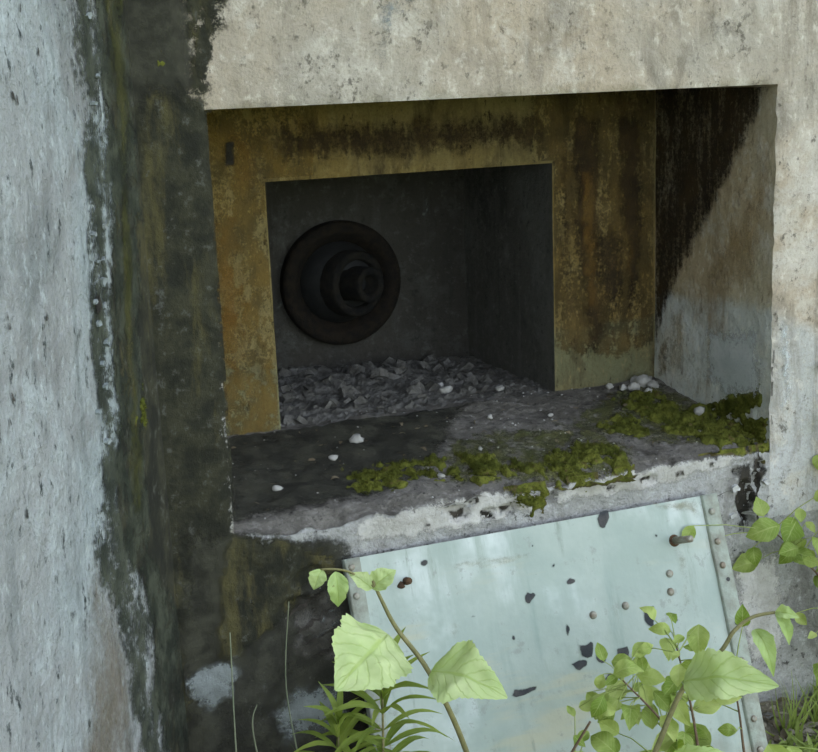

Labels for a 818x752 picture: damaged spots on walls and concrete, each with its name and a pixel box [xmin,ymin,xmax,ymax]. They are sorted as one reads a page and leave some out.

water stain [64,0,476,752]
water stain [707,331,760,395]
spalling [357,449,771,542]